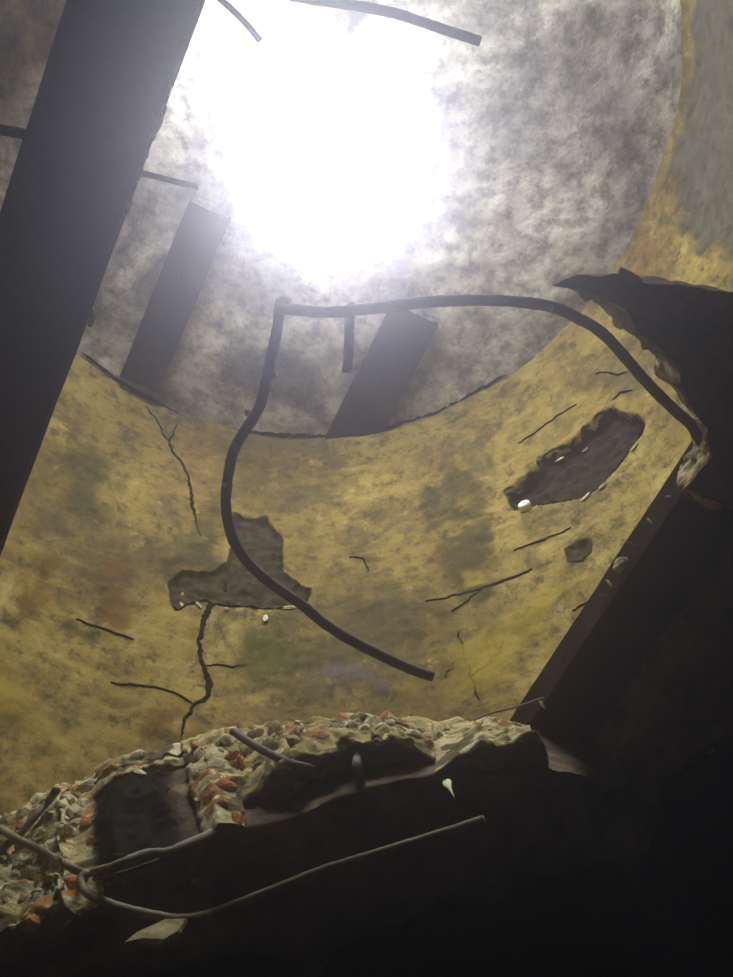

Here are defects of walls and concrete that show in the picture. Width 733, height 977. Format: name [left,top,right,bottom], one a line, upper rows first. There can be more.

spalling [616,267,642,282]
spalling [168,294,728,682]
crack [518,404,577,443]
crack [76,618,134,640]
crack [110,583,247,739]
crack [426,527,571,701]
spalling [0,710,549,965]